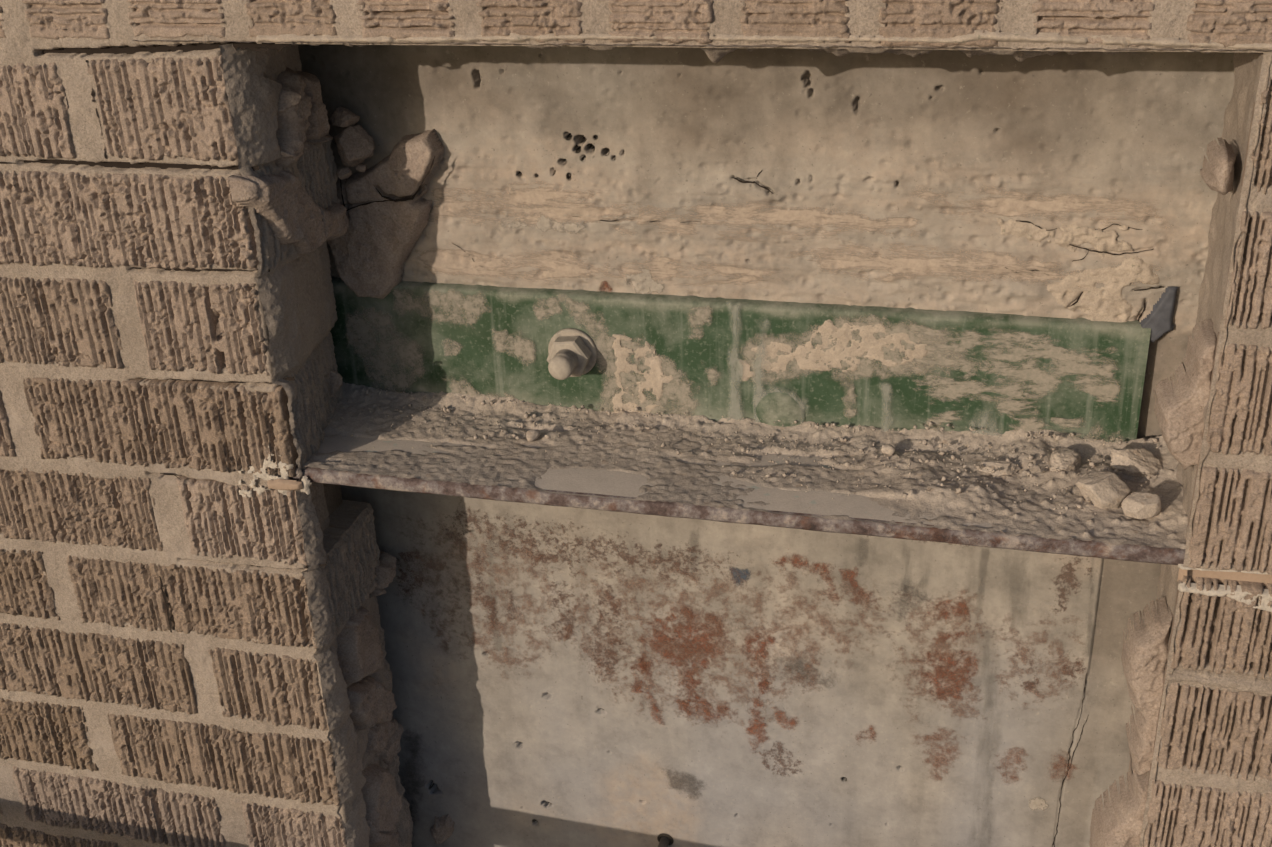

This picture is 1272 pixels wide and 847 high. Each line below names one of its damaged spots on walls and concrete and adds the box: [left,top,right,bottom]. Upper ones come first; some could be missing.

crack [42,42,292,55]
crack [0,159,259,171]
peeling [346,289,486,394]
peeling [492,330,535,363]
peeling [534,295,697,416]
peeling [689,306,711,338]
peeling [738,315,1120,443]
rust [883,530,1004,545]
crack [159,576,172,632]
rust [398,509,876,775]
rust [900,600,983,716]
crack [1052,673,1088,847]